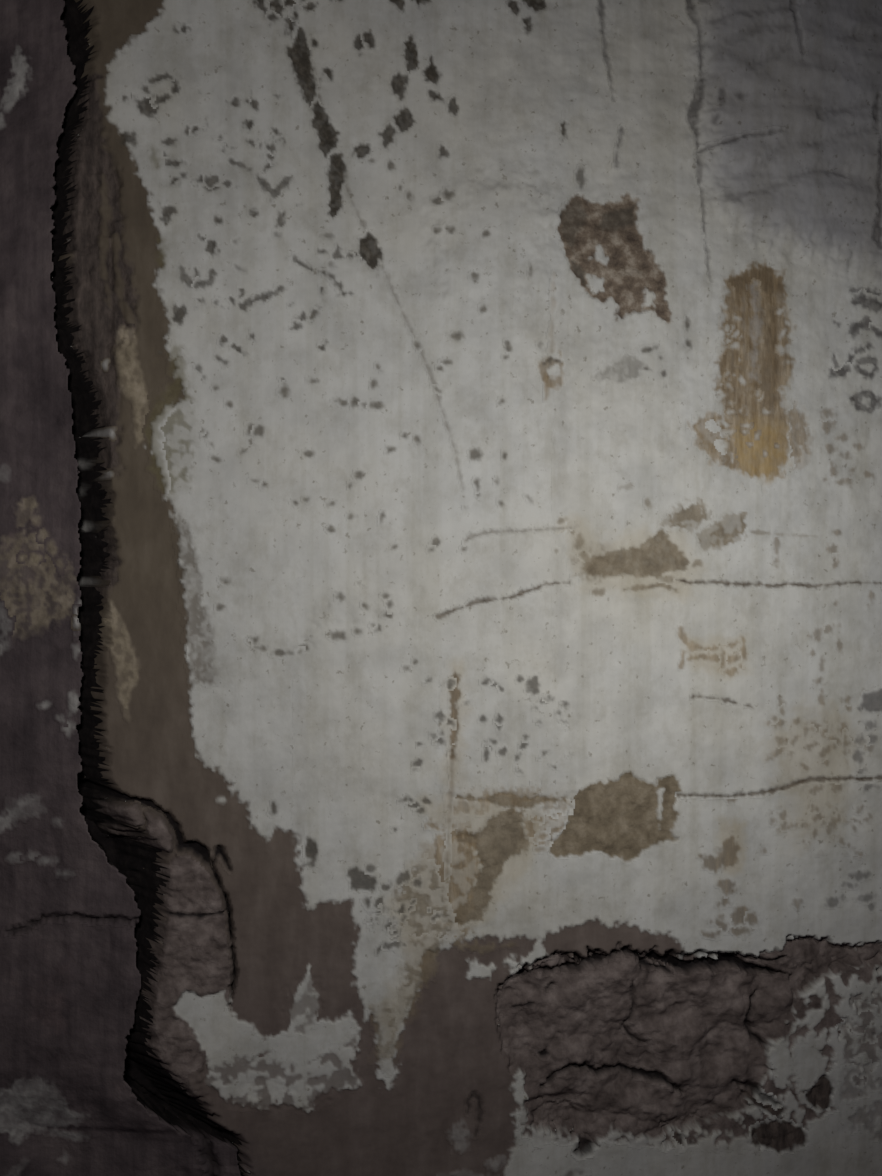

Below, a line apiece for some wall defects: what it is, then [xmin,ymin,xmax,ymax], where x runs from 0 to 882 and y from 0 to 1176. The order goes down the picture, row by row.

peeling [160,87,295,204]
spalling [58,0,194,609]
peeling [555,163,695,354]
peeling [589,343,668,389]
corrosion [686,258,819,496]
crack [1,0,246,1176]
crack [433,579,573,622]
crack [673,575,882,591]
peeling [89,397,882,1176]
crack [675,773,882,801]
crack [497,945,791,1098]
crack [571,1131,601,1161]